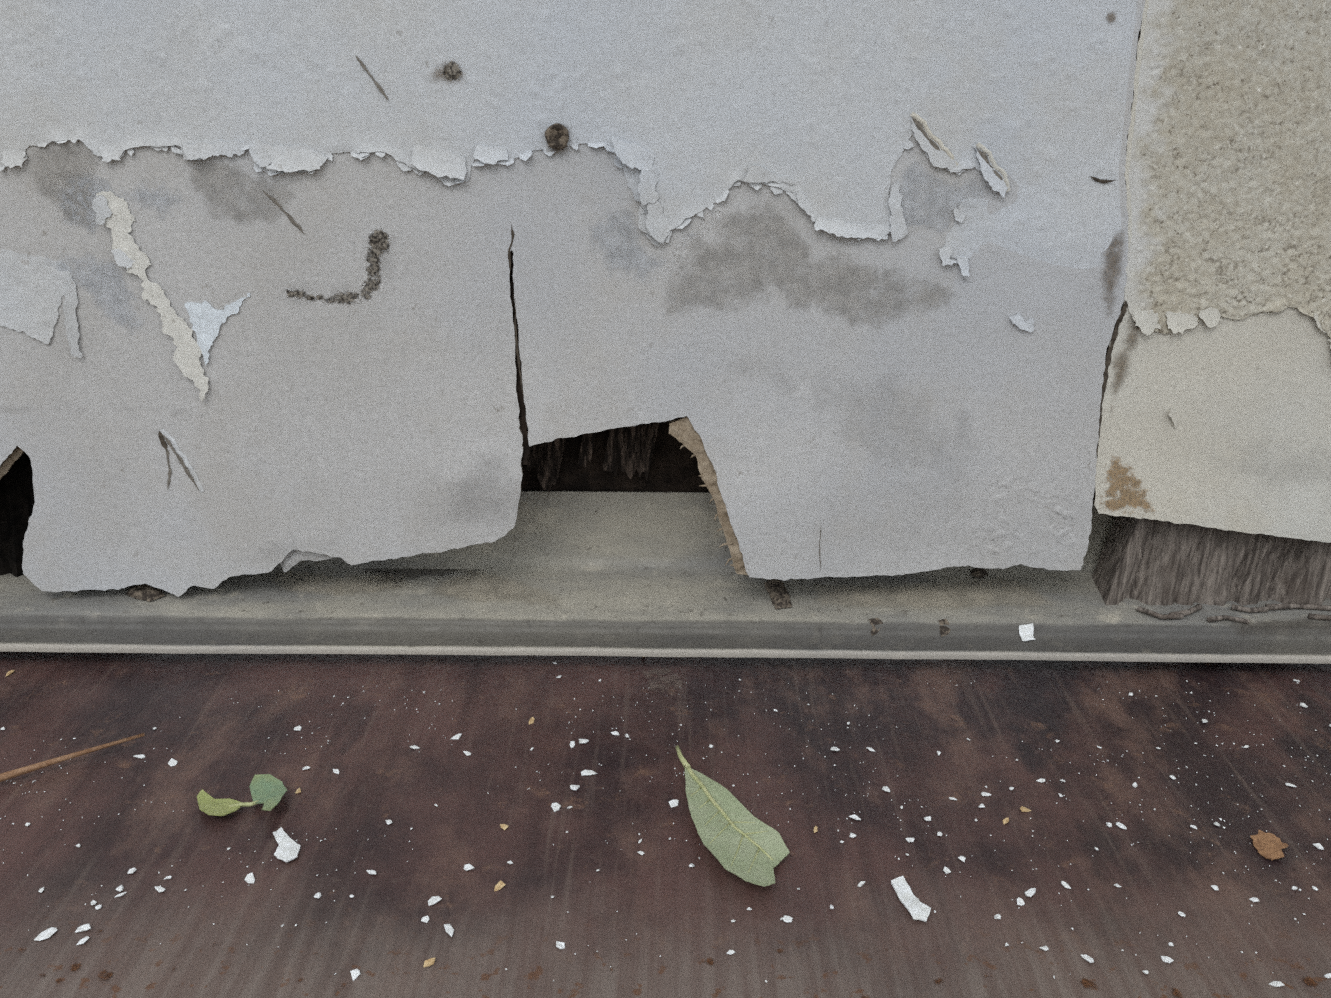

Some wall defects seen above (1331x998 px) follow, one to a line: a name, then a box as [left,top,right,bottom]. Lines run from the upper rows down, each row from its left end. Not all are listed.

peeling [0,0,1138,277]
peeling [0,249,83,358]
peeling [92,191,250,401]
spalling [286,229,389,304]
crack [508,224,530,465]
peeling [1009,313,1035,333]
spalling [0,447,24,480]
spalling [669,416,748,575]
rust [1106,460,1150,510]